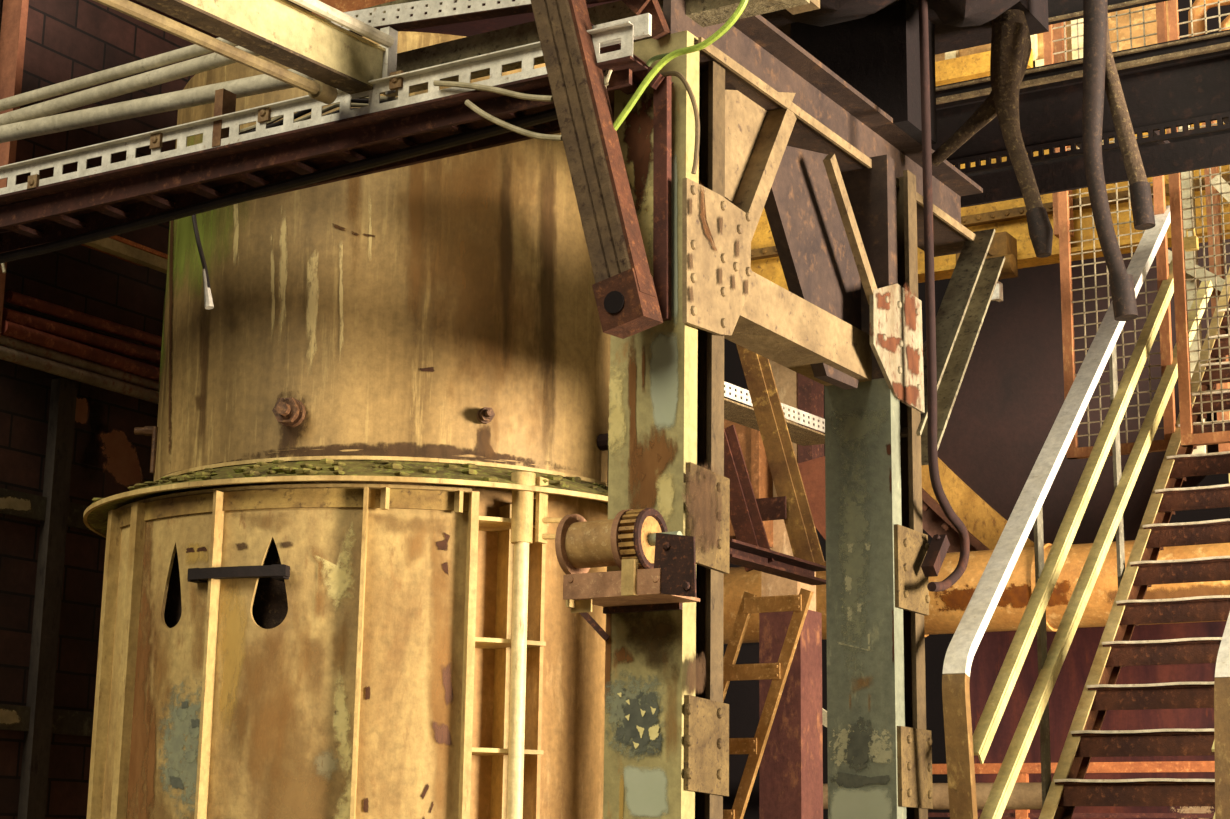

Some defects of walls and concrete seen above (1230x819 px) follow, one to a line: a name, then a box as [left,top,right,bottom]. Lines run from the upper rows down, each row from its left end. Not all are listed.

damp [271,219,287,329]
damp [307,255,318,362]
damp [500,182,511,336]
damp [540,167,556,397]
rust [876,288,921,408]
rust [628,339,645,510]
rust [935,585,975,611]
rust [997,581,1032,608]
rust [1048,580,1072,607]
peeling [159,682,202,819]
peeling [605,674,663,760]
peeling [829,717,893,787]